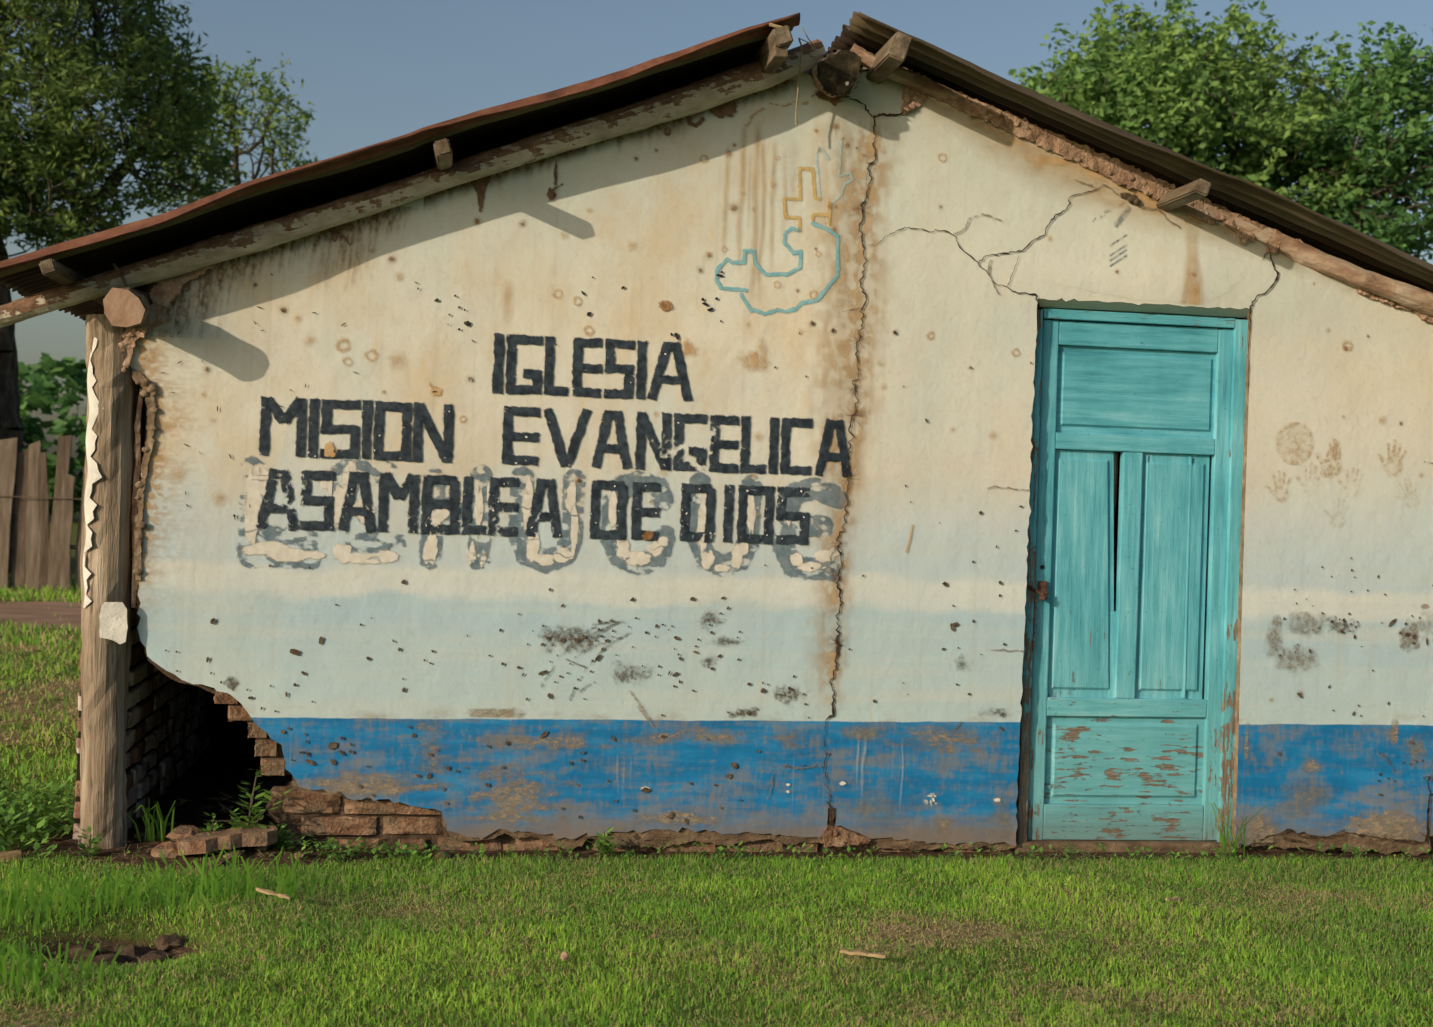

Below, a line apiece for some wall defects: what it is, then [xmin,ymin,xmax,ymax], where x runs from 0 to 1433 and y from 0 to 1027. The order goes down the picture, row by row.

crack [745,70,1180,809]
peeling [233,461,399,569]
peeling [413,507,450,565]
peeling [467,483,505,567]
peeling [515,460,668,566]
spalling [206,657,1015,852]